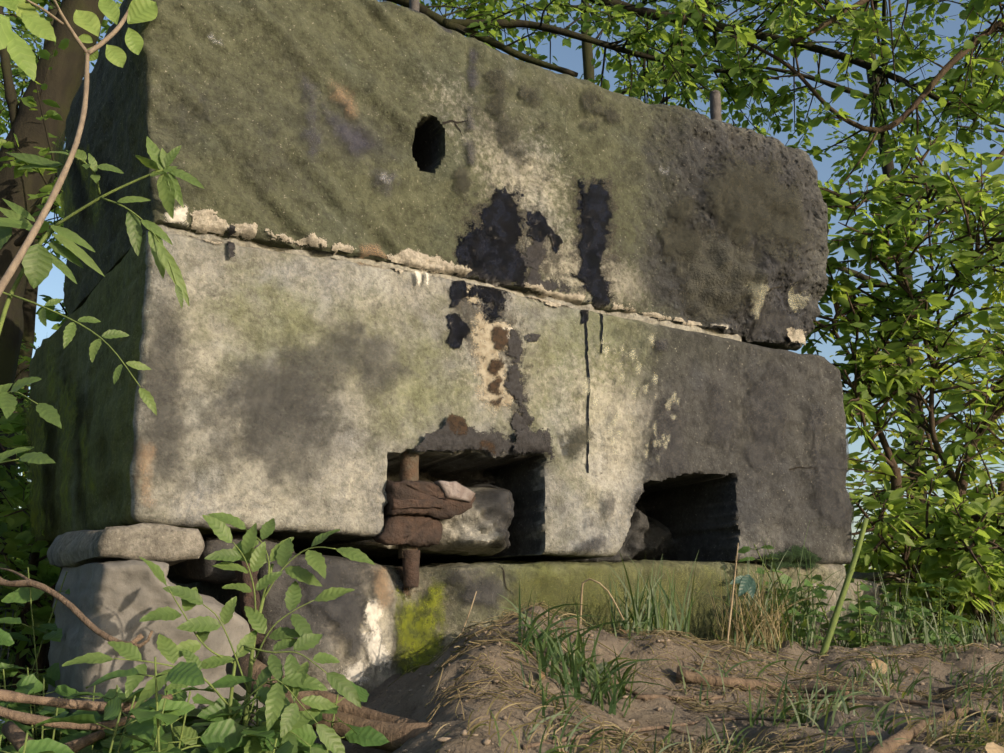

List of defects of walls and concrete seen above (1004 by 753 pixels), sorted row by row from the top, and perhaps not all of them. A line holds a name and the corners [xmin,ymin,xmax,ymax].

leakage [462,174,619,295]
peeling [526,211,563,254]
spalling [165,207,513,409]
spalling [524,282,586,308]
spalling [612,302,728,329]
leakage [445,280,541,433]
leakage [581,310,603,429]
spalling [413,413,555,463]
spalling [564,424,596,457]